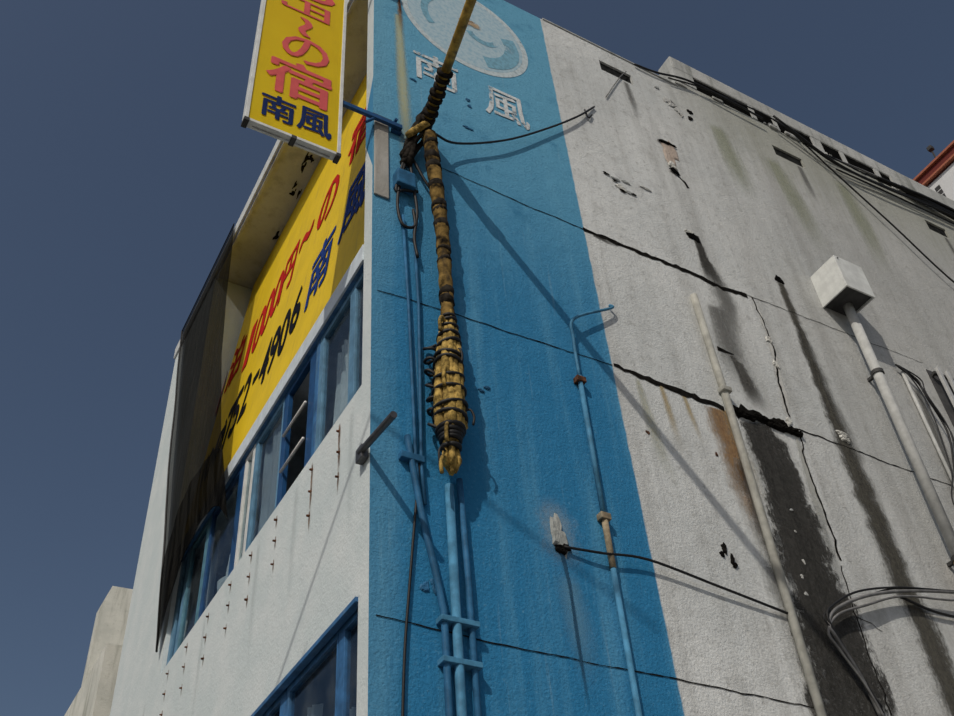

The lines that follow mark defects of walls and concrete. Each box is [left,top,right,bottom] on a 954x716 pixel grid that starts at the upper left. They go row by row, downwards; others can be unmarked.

peeling [603,171,652,196]
spalling [658,139,689,188]
water stain [684,229,757,393]
crack [376,168,951,715]
spalling [719,542,738,569]
rust [708,407,752,508]
water stain [740,421,896,716]
water stain [775,275,954,716]